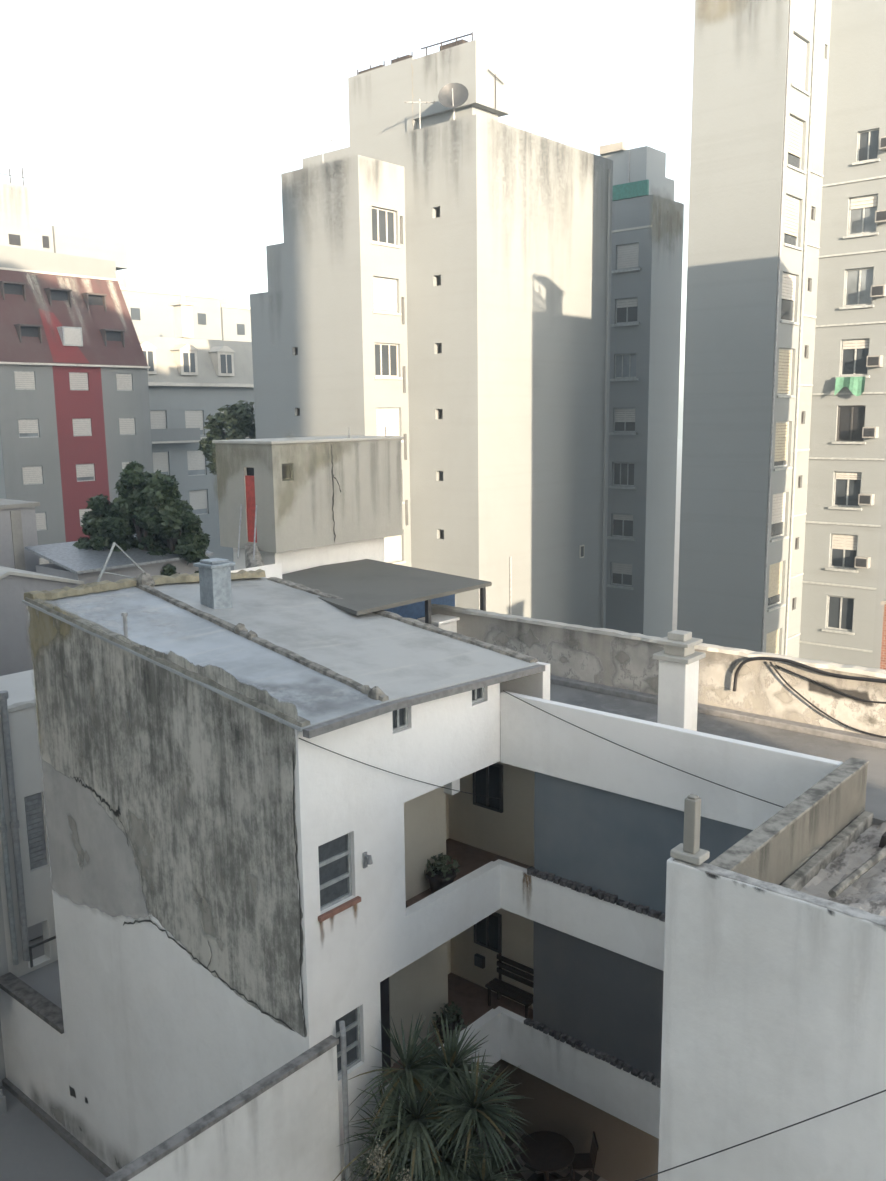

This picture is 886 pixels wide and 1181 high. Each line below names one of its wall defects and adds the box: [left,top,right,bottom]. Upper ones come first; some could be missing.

crack [331,445,341,542]
peeling [485,629,664,692]
peeling [698,661,886,735]
leakage [29,608,307,1037]
crack [74,753,305,1034]